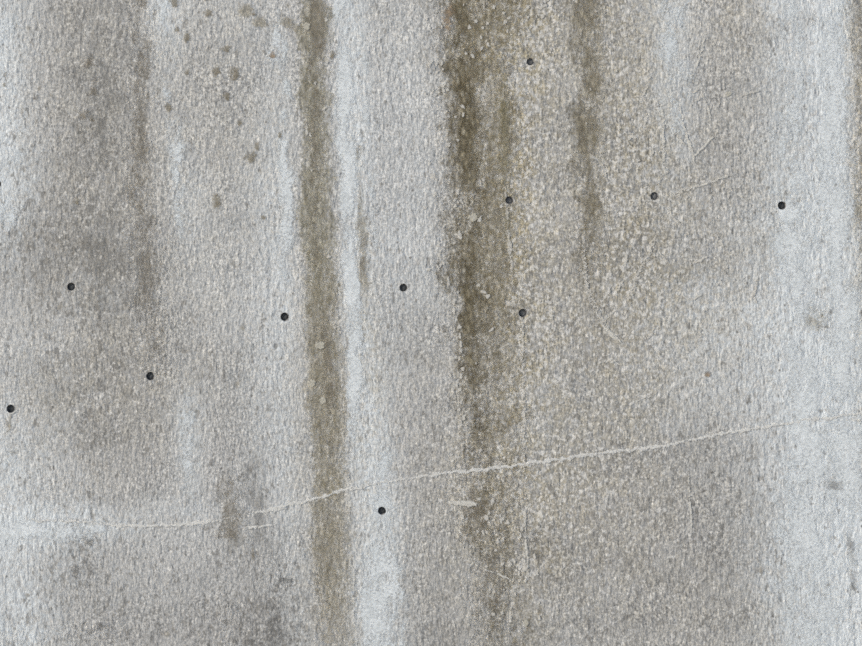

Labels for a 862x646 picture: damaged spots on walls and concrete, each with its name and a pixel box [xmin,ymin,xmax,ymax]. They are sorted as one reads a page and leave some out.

damp [322,32,368,449]
damp [434,0,513,390]
crack [27,518,225,528]
damp [359,451,406,646]
damp [510,321,526,476]
crack [247,412,862,529]